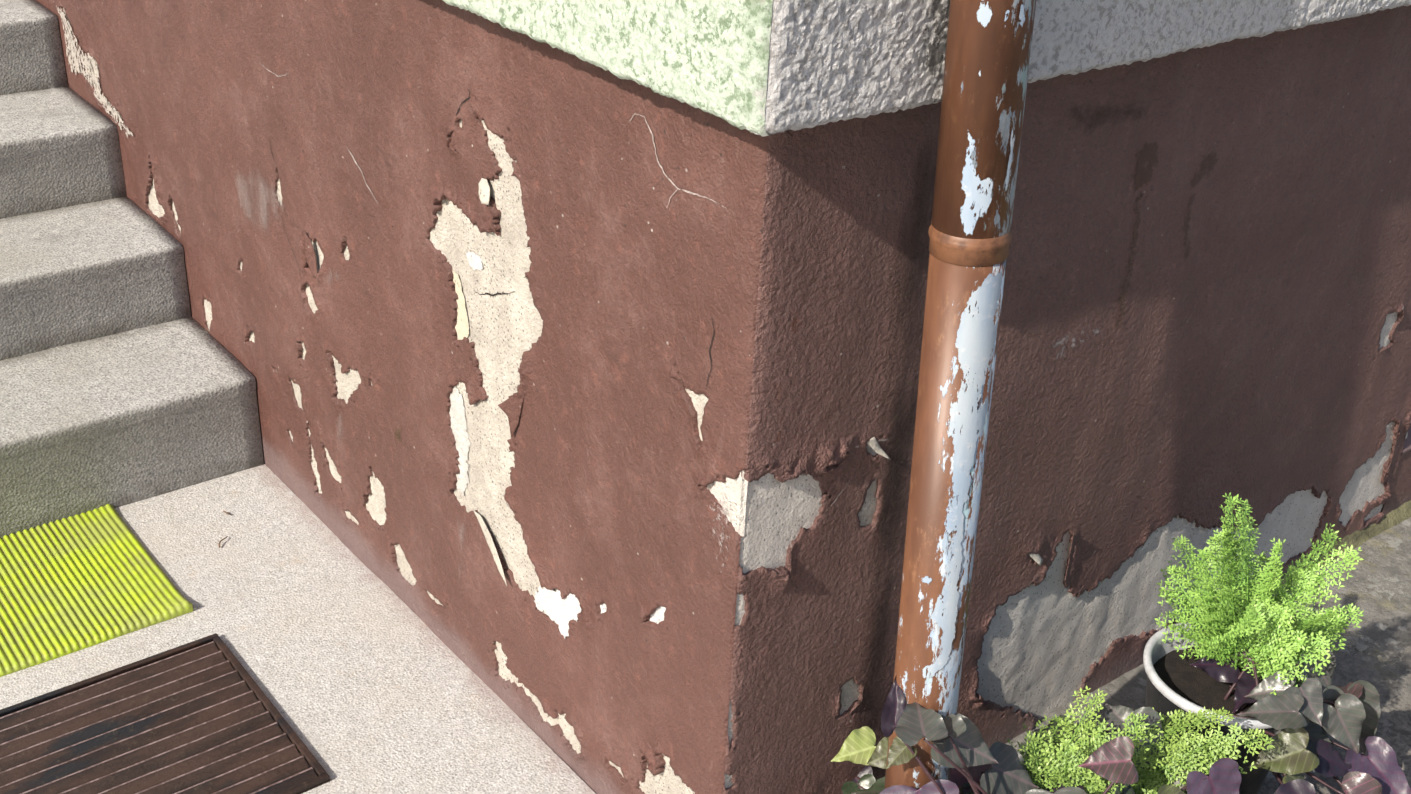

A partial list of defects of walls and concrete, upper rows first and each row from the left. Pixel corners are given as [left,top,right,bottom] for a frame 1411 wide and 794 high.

peeling [56,6,133,138]
crack [630,113,726,208]
peeling [429,120,582,638]
peeling [735,594,745,626]
peeling [707,469,822,574]
peeling [919,272,1002,679]
peeling [977,420,1411,719]
peeling [494,641,581,754]
peeling [639,754,695,794]